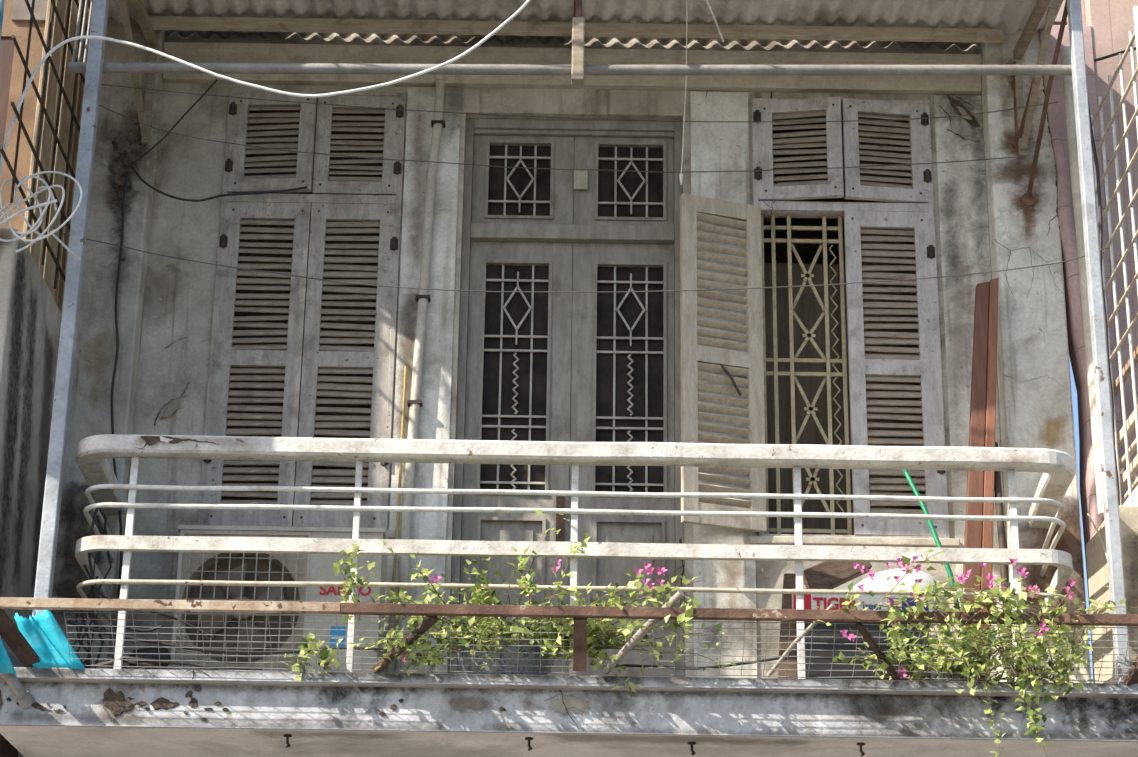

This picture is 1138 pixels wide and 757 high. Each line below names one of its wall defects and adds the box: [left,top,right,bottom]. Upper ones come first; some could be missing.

corrosion [1014,189,1040,231]
crack [994,75,1062,329]
damp [0,253,53,594]
peeling [135,382,216,449]
damp [51,486,101,616]
peeling [103,684,229,722]